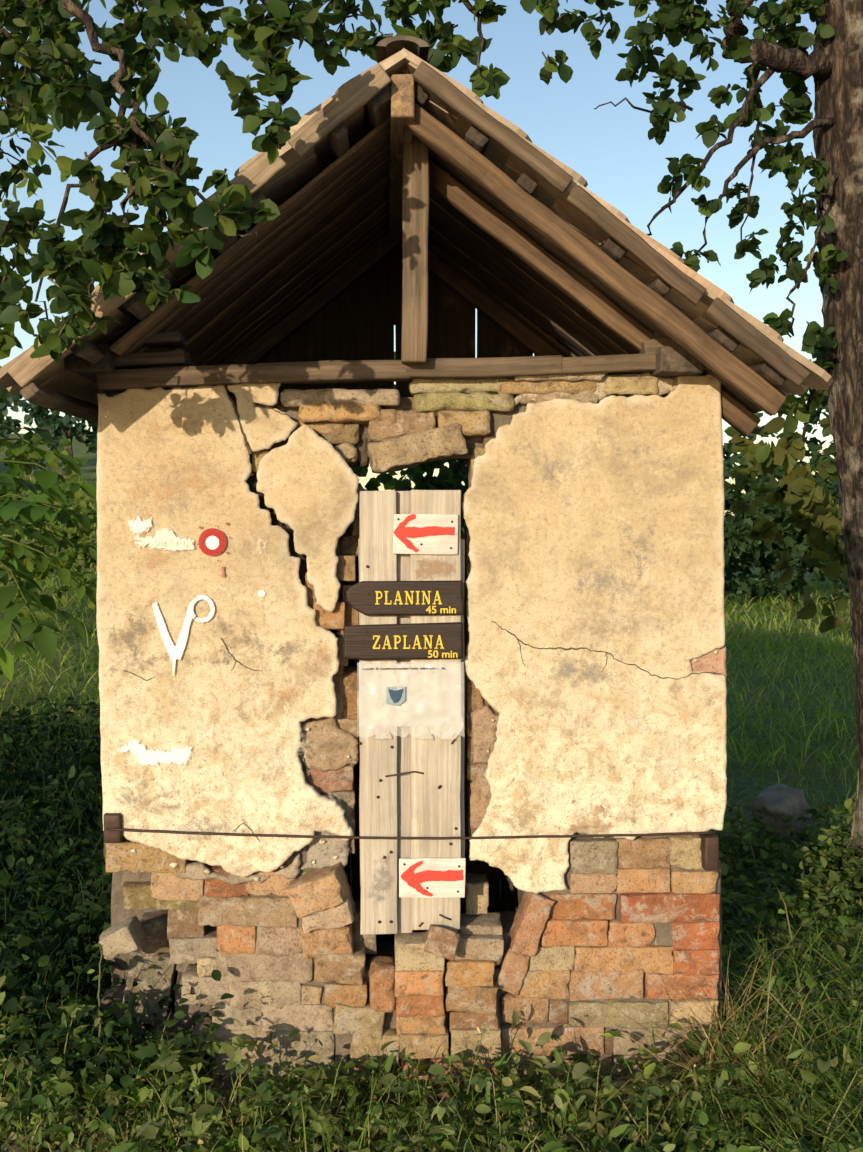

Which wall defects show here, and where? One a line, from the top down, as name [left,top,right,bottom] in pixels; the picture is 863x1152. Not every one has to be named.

crack [224,386,340,637]
crack [492,621,721,680]
spalling [690,646,727,677]
spalling [299,717,359,772]
spalling [470,704,499,764]
spalling [170,831,350,885]